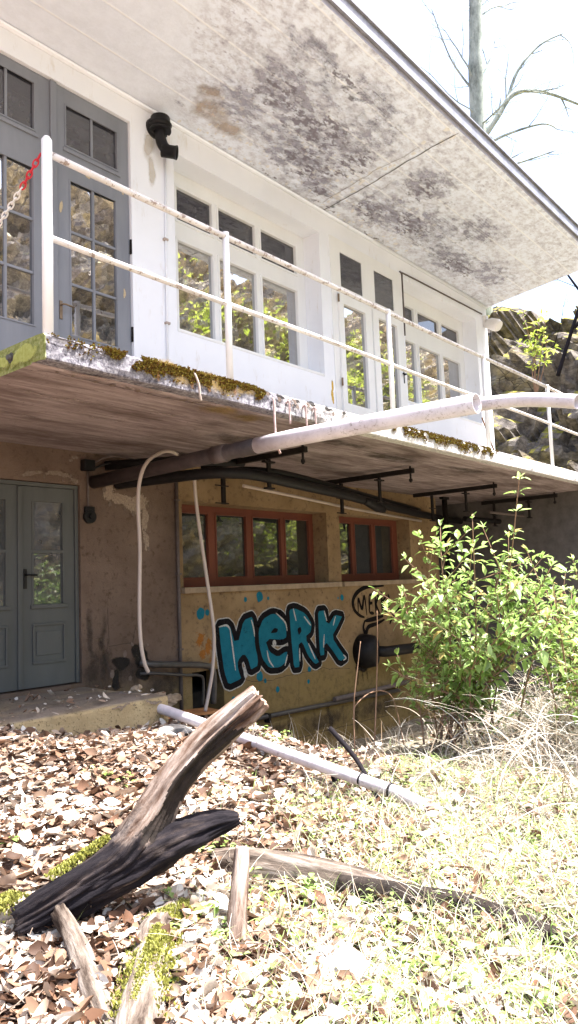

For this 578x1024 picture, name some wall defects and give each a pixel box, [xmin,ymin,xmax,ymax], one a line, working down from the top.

leakage [196,34,395,213]
crack [324,127,458,210]
leakage [352,170,504,284]
flaking render [102,485,151,551]